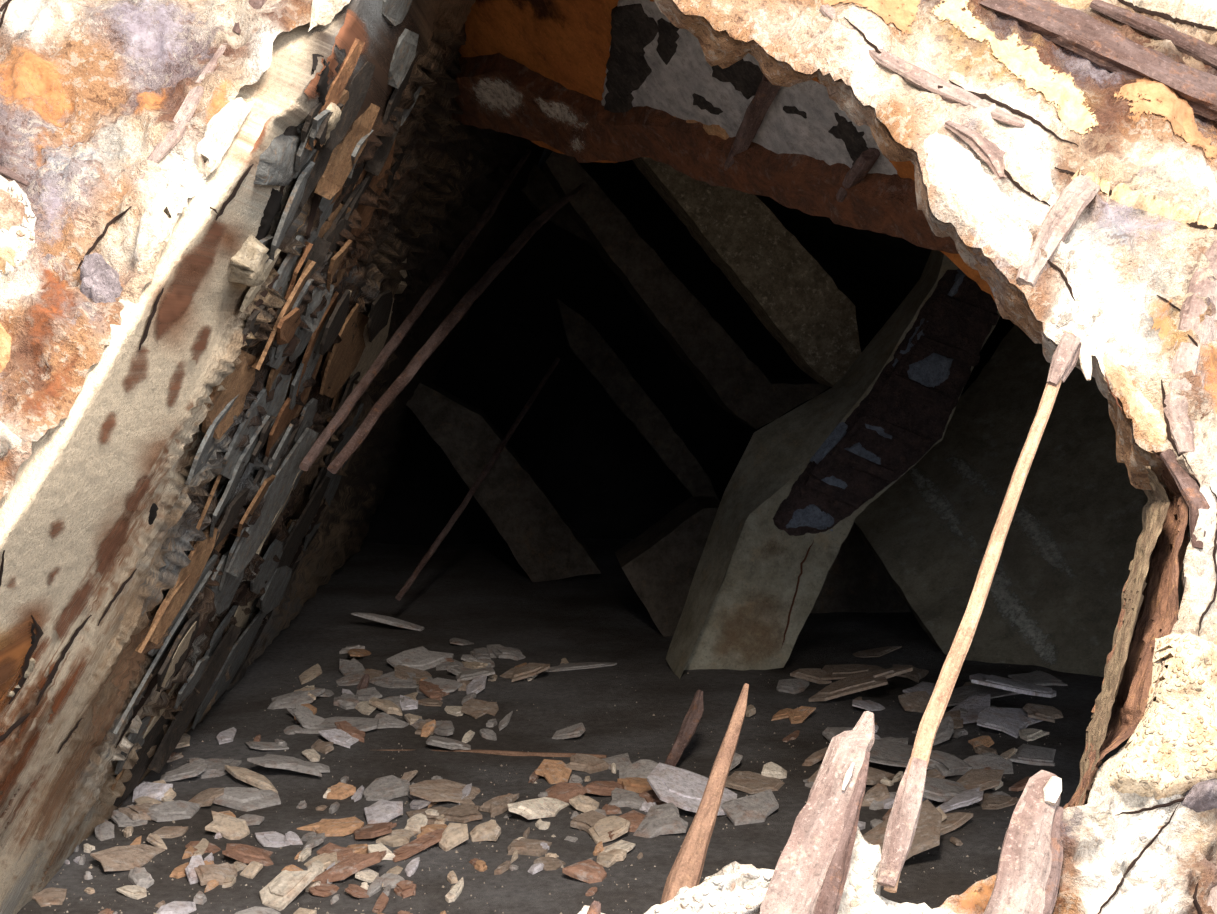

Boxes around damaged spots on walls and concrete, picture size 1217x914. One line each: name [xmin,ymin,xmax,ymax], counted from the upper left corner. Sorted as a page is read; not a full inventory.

peeling [601,0,763,140]
peeling [824,0,1099,134]
peeling [1115,0,1217,28]
crack [77,206,132,270]
corrosion [157,221,225,339]
spalling [924,131,1053,269]
corrosion [124,347,149,390]
corrosion [168,326,211,406]
crack [1161,379,1217,636]
crack [0,569,137,742]
corrosion [0,476,166,891]
crack [1098,797,1185,914]